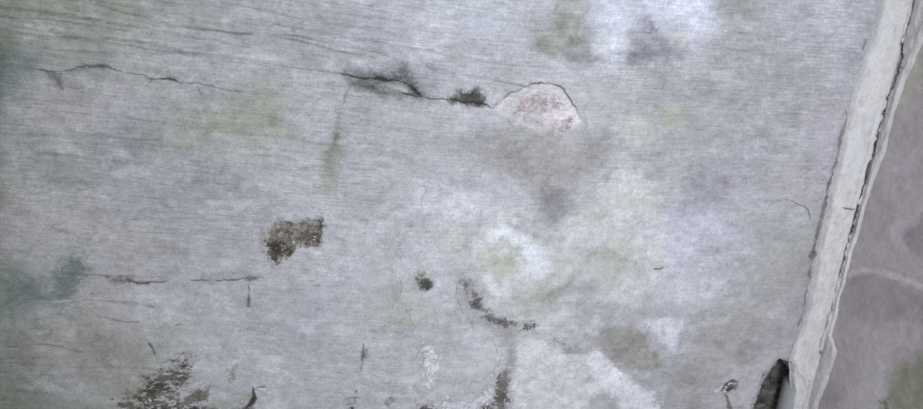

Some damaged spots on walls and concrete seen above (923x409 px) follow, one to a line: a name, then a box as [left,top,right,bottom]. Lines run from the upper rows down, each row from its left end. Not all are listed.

crack [41,61,183,92]
crack [338,58,491,111]
crack [802,0,914,409]
crack [104,273,166,289]
crack [192,274,266,309]
spalling [257,212,328,269]
leakage [389,123,773,409]
leakage [70,350,265,409]